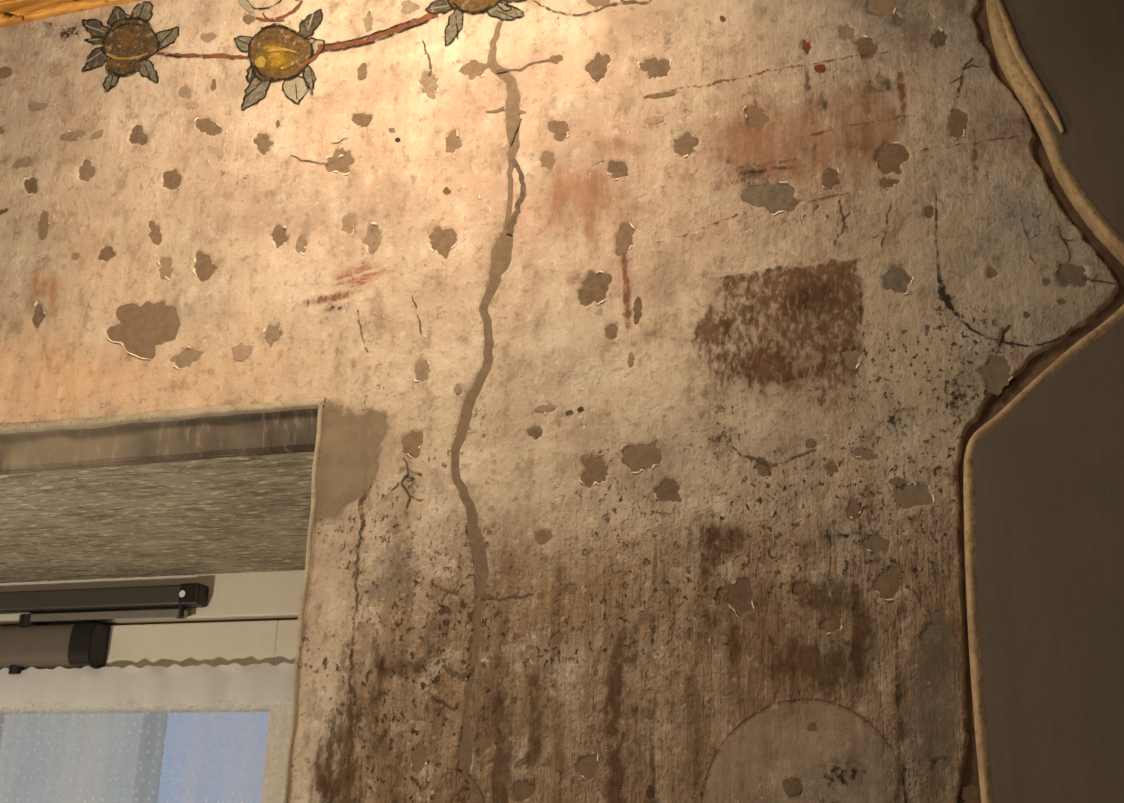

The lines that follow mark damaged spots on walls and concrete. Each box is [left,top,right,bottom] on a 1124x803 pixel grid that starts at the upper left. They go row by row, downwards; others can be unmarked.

crack [421,40,432,75]
crack [533,0,651,16]
flaking render [741,181,798,215]
flaking render [106,301,180,359]
flaking render [170,346,203,368]
crack [427,21,558,803]
corrosion [691,259,863,403]
crack [347,458,423,753]
water stain [768,580,886,697]
water stain [312,650,421,803]
water stain [491,692,512,803]
water stain [606,624,638,803]